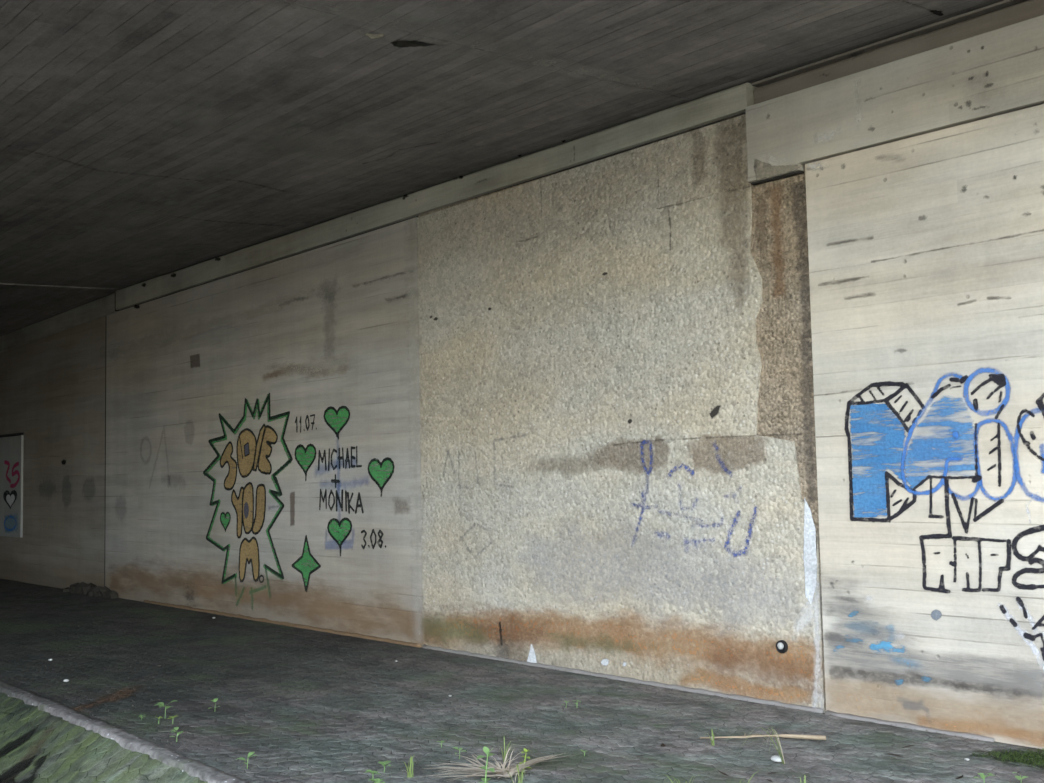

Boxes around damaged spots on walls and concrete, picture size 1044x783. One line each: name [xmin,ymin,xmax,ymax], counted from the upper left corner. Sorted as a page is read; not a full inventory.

spalling [365,33,436,48]
rust [424,615,816,700]